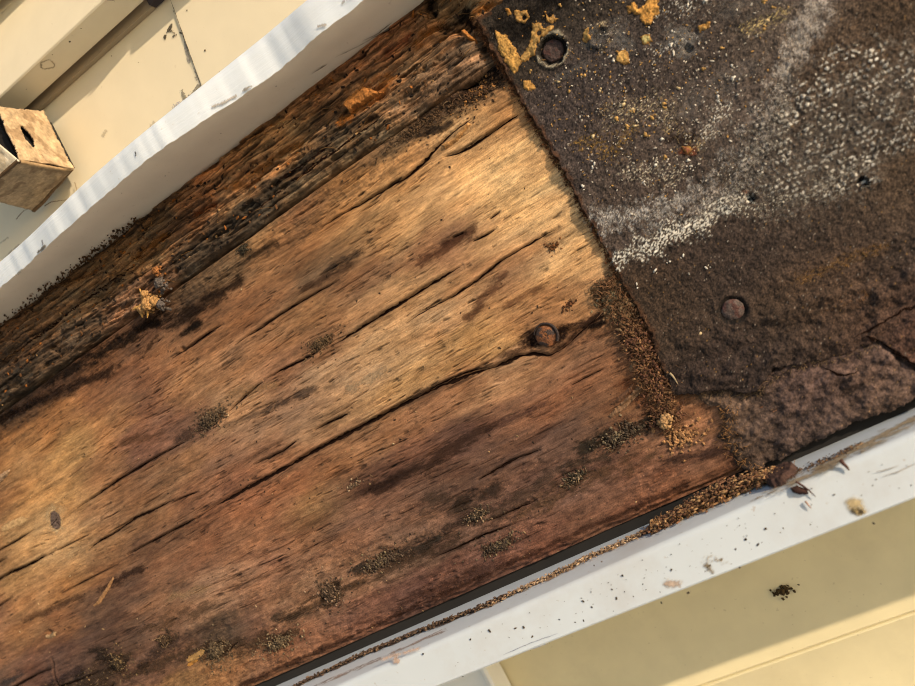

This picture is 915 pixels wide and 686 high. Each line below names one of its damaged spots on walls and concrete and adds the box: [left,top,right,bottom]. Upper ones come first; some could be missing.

crack [232,111,388,230]
crack [323,116,517,227]
damp [418,121,453,137]
damp [574,0,915,271]
crack [0,262,141,362]
damp [0,274,244,425]
damp [266,386,316,412]
crack [230,229,556,411]
damp [420,225,475,268]
damp [464,273,505,320]
rust [502,312,604,358]
crack [0,320,595,601]